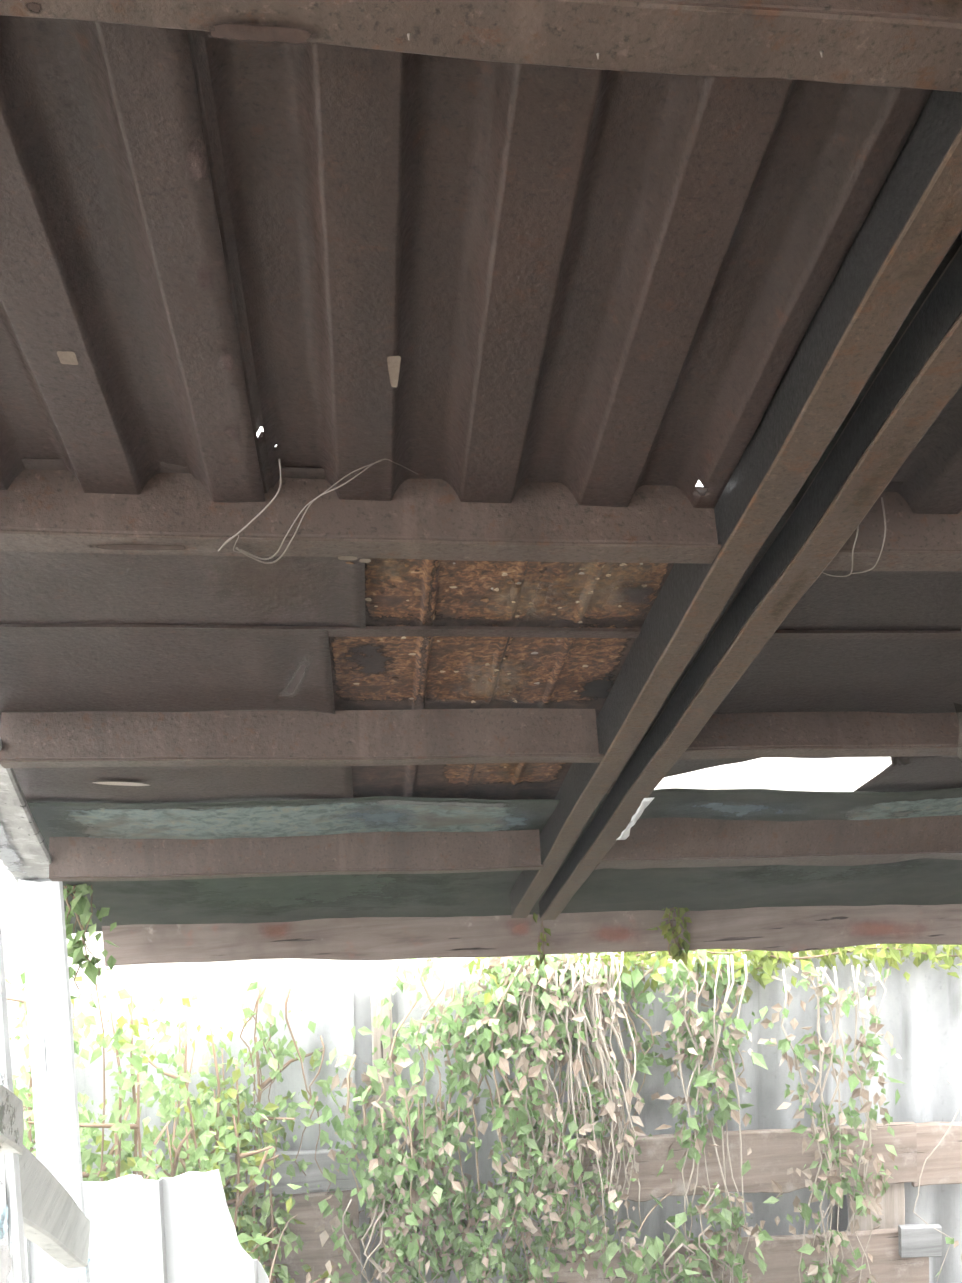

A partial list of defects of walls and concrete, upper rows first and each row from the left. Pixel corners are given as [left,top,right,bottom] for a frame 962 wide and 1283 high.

rust [330,556,670,706]
rust [443,763,566,786]
peeling [0,825,27,883]